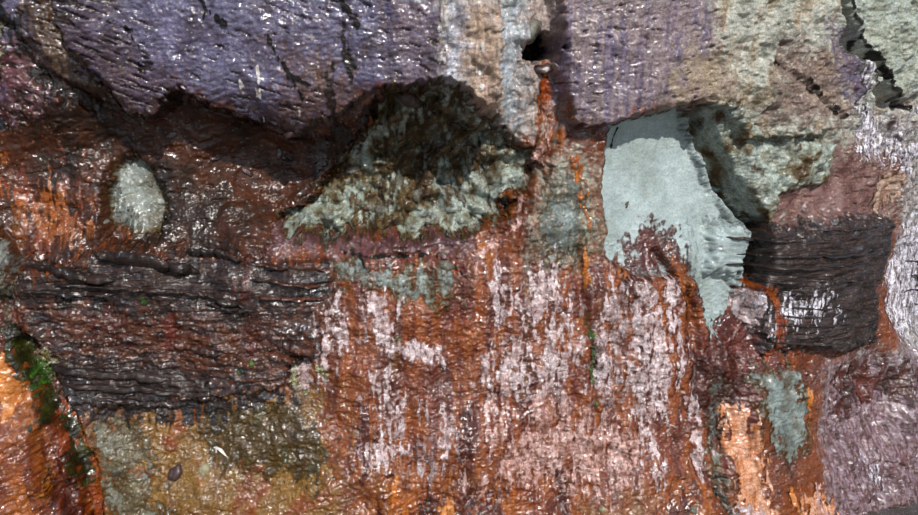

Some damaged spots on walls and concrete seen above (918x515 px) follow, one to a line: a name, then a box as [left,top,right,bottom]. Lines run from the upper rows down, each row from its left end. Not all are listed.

crack [774,0,913,122]
spalling [0,75,765,343]
corrosion [0,296,103,515]
leakage [89,302,129,360]
leakage [59,381,299,430]
leakage [228,247,271,361]
corrosion [348,400,600,515]
leakage [313,243,715,513]
corrosion [613,213,780,515]
corrosion [737,275,788,365]
corrosion [789,482,839,515]